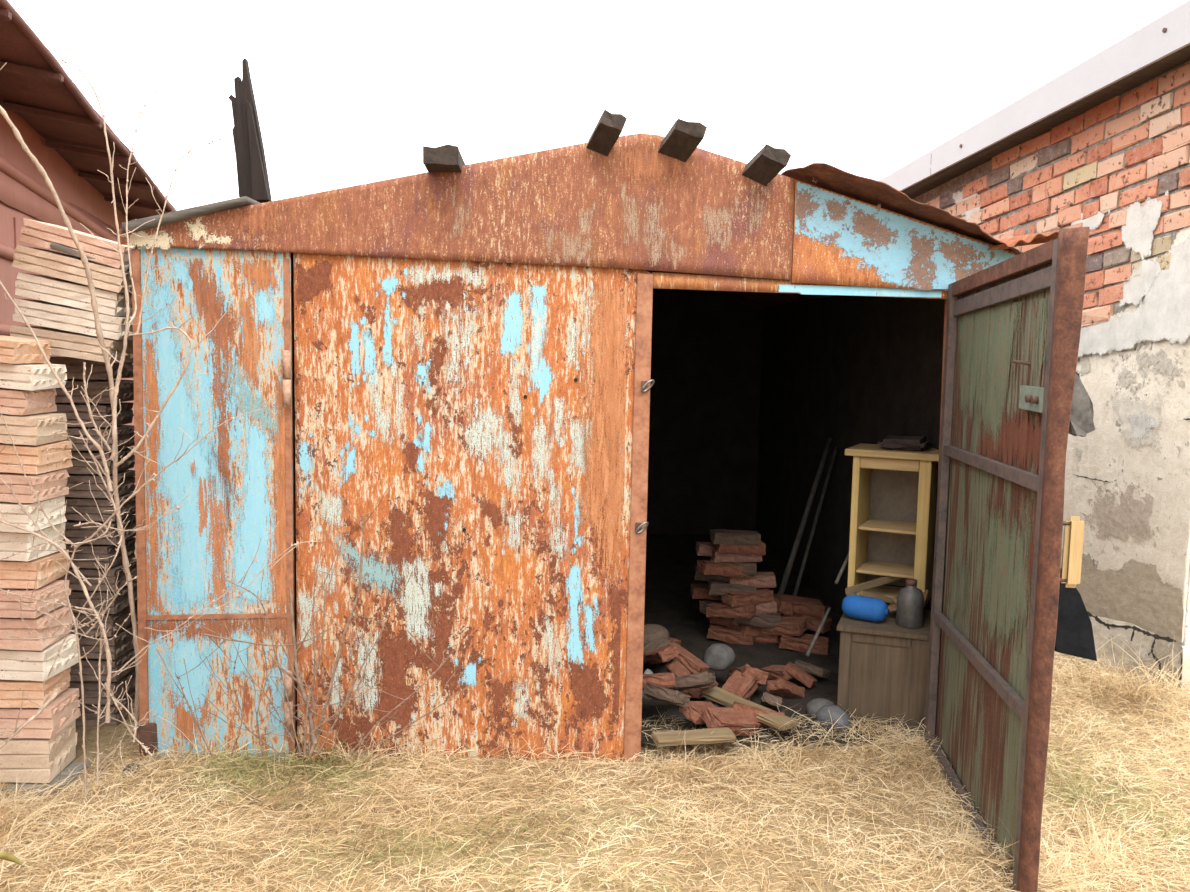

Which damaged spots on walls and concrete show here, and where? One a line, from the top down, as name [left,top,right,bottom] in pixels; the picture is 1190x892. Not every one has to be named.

corrosion [607,138,692,200]
flaking render [777,60,1190,327]
corrosion [398,275,485,322]
peeling [121,216,291,746]
corrosion [142,202,292,648]
corrosion [341,487,456,596]
corrosion [400,433,423,477]
corrosion [420,330,452,423]
corrosion [472,493,515,548]
corrosion [505,404,524,460]
corrosion [568,275,628,740]
corrosion [328,602,469,755]